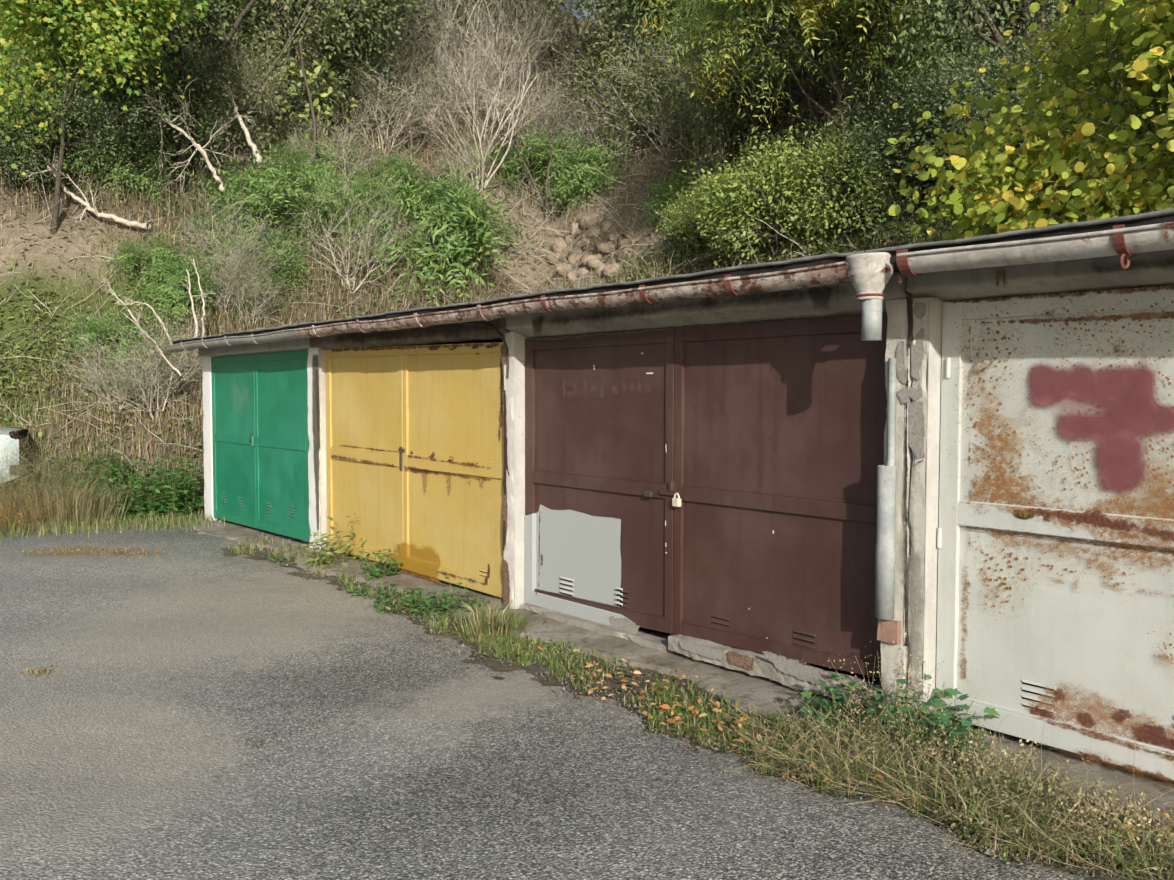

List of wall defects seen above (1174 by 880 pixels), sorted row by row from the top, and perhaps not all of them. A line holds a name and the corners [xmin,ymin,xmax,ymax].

rust [331,445,490,494]
rust [948,271,1174,678]
rust [343,552,490,586]
spalling [679,637,820,685]
rust [1030,687,1174,761]
rust [1066,751,1173,784]